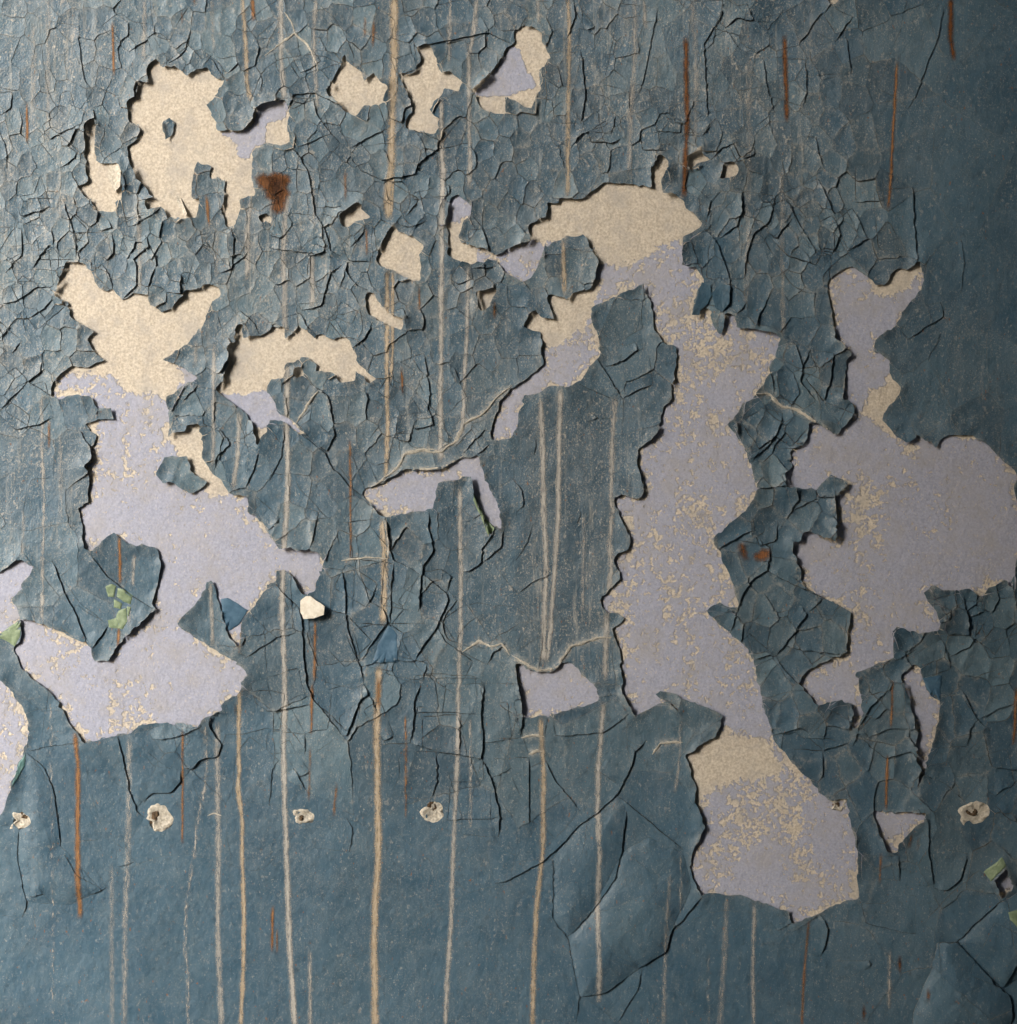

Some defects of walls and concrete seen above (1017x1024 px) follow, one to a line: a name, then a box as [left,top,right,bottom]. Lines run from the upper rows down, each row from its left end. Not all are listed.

peeling [69,37,299,235]
rust [256,173,289,213]
crack [217,12,441,335]
peeling [301,17,565,155]
rust [888,66,898,204]
crack [0,196,186,430]
peeling [0,191,436,743]
crack [244,353,512,495]
peeling [352,118,1017,945]
rust [73,736,82,915]
spalling [146,804,173,832]
crack [117,481,702,1022]